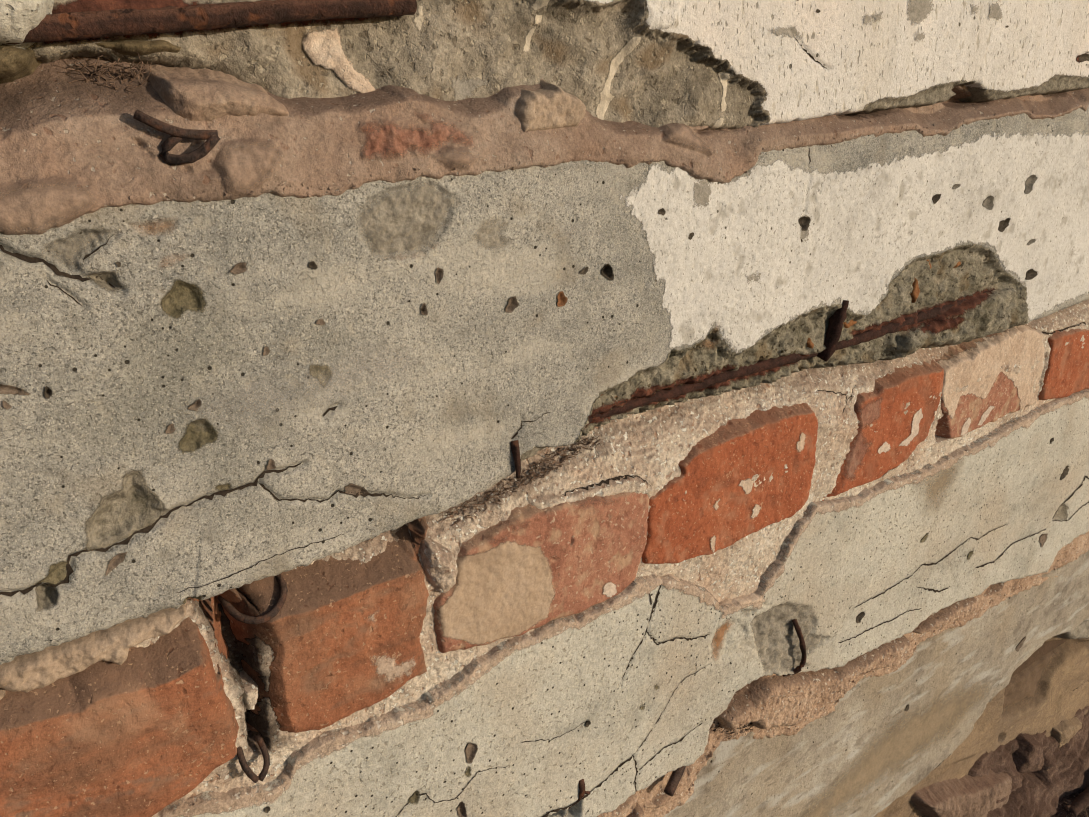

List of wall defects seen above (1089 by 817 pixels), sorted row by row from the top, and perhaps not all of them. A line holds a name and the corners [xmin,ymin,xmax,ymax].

rust [52,0,220,14]
rust [43,17,379,44]
peeling [771,26,802,39]
peeling [907,0,934,42]
spalling [845,75,1089,115]
peeling [574,131,1089,444]
rust [843,278,994,336]
rust [579,338,814,440]
crack [0,462,428,597]
crack [839,476,1089,643]
crack [620,581,710,684]
crack [542,667,705,817]